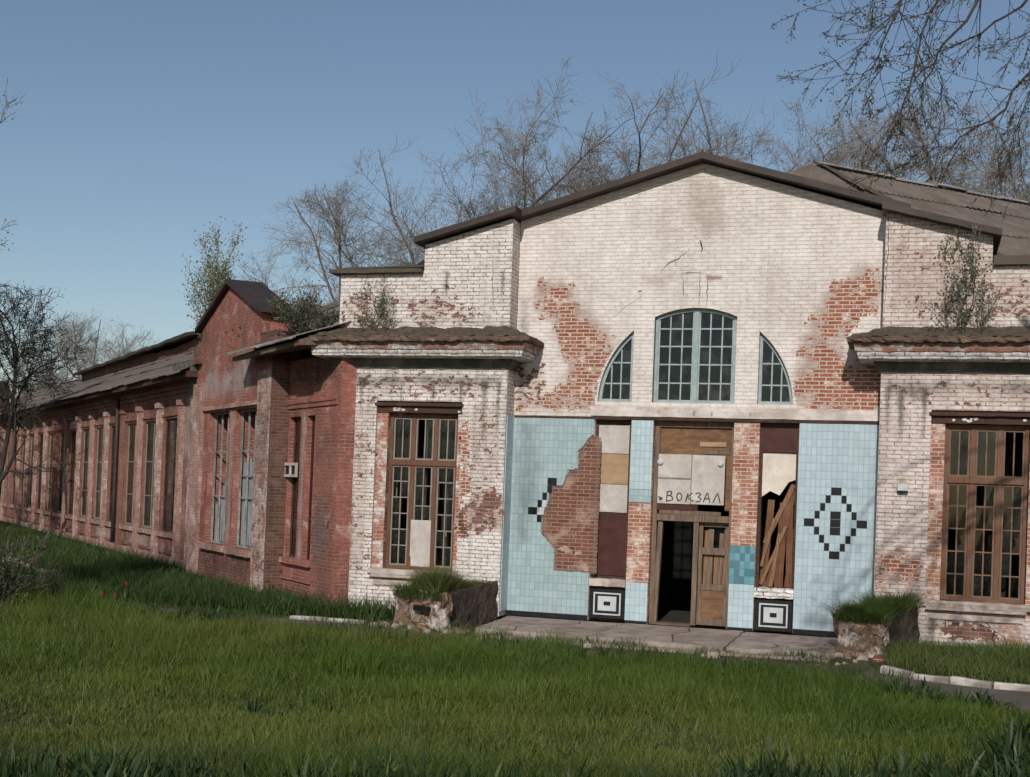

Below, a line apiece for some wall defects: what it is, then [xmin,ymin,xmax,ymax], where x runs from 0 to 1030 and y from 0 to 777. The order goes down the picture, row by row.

spalling [340,285,483,328]
spalling [936,278,1030,320]
peeling [514,276,616,412]
peeling [793,268,1007,423]
spalling [356,371,490,411]
peeling [454,400,506,538]
peeling [875,545,928,589]
peeling [941,620,999,646]